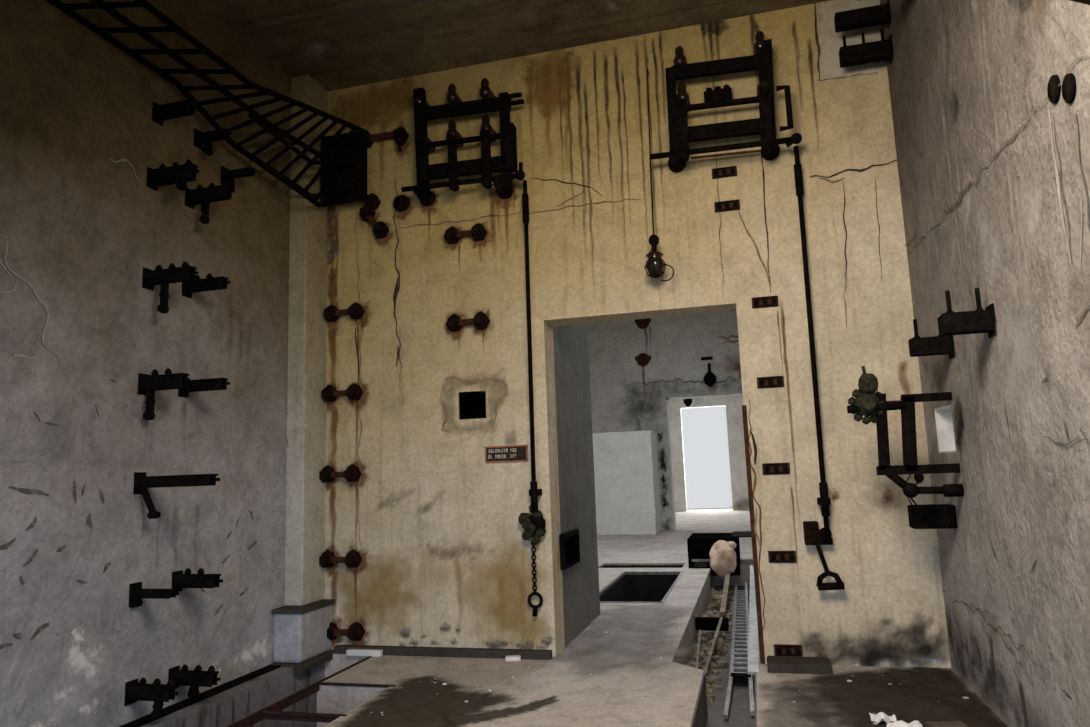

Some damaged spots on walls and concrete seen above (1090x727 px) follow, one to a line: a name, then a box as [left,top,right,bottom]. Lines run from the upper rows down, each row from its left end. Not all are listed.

damp [525,53,626,157]
damp [637,35,661,141]
rust [446,181,518,256]
crack [810,55,1090,328]
rust [329,268,337,307]
crack [393,178,641,377]
rust [327,320,338,366]
rust [327,382,369,448]
rust [326,461,366,523]
rust [326,546,366,602]
damp [804,615,1004,708]
damp [342,676,557,727]